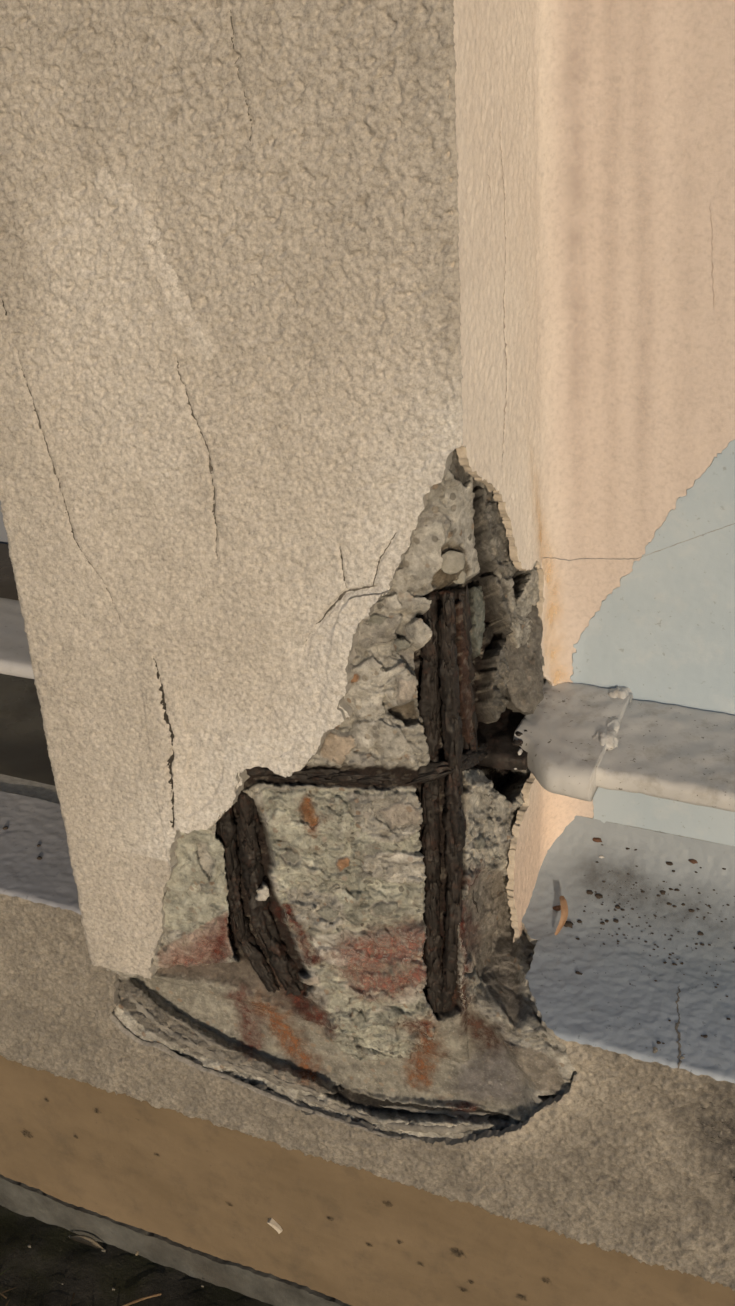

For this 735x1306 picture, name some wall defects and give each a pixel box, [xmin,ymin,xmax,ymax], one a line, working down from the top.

crack [19,359,121,622]
crack [177,361,218,559]
crack [306,533,396,641]
crack [153,656,175,828]
spalling [107,449,575,1141]
rust [230,969,331,1082]
rust [278,904,322,964]
rust [341,905,513,1049]